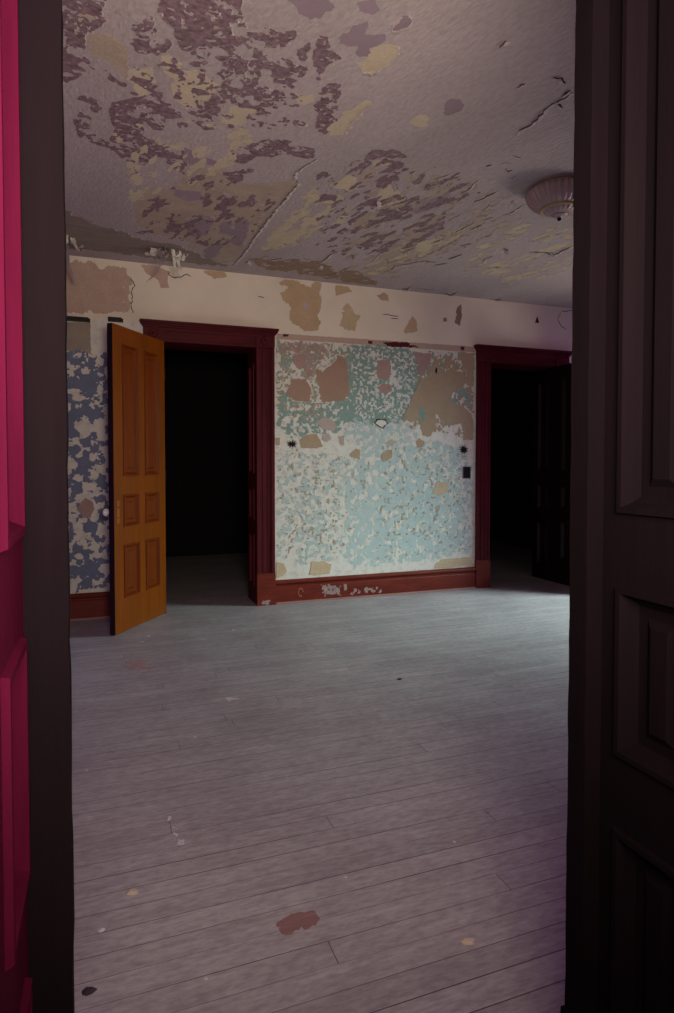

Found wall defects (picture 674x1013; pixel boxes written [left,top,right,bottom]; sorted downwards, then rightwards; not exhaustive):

peeling [62,0,413,593]
peeling [247,149,573,598]
crack [516,90,574,136]